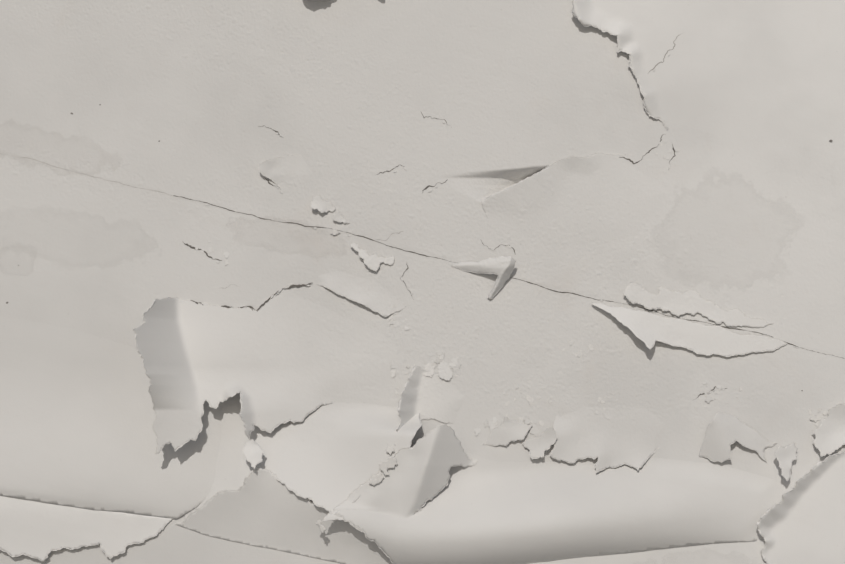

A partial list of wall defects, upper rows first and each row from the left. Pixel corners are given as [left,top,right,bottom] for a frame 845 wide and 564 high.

crack [649,34,681,72]
peeling [571,0,845,147]
crack [604,136,677,169]
crack [0,153,456,300]
peeling [481,152,673,252]
crack [191,283,311,312]
peeling [316,243,406,317]
crack [514,278,845,359]
peeling [592,282,788,357]
peeling [0,283,478,564]
peeling [483,401,666,473]
peeling [699,403,845,564]